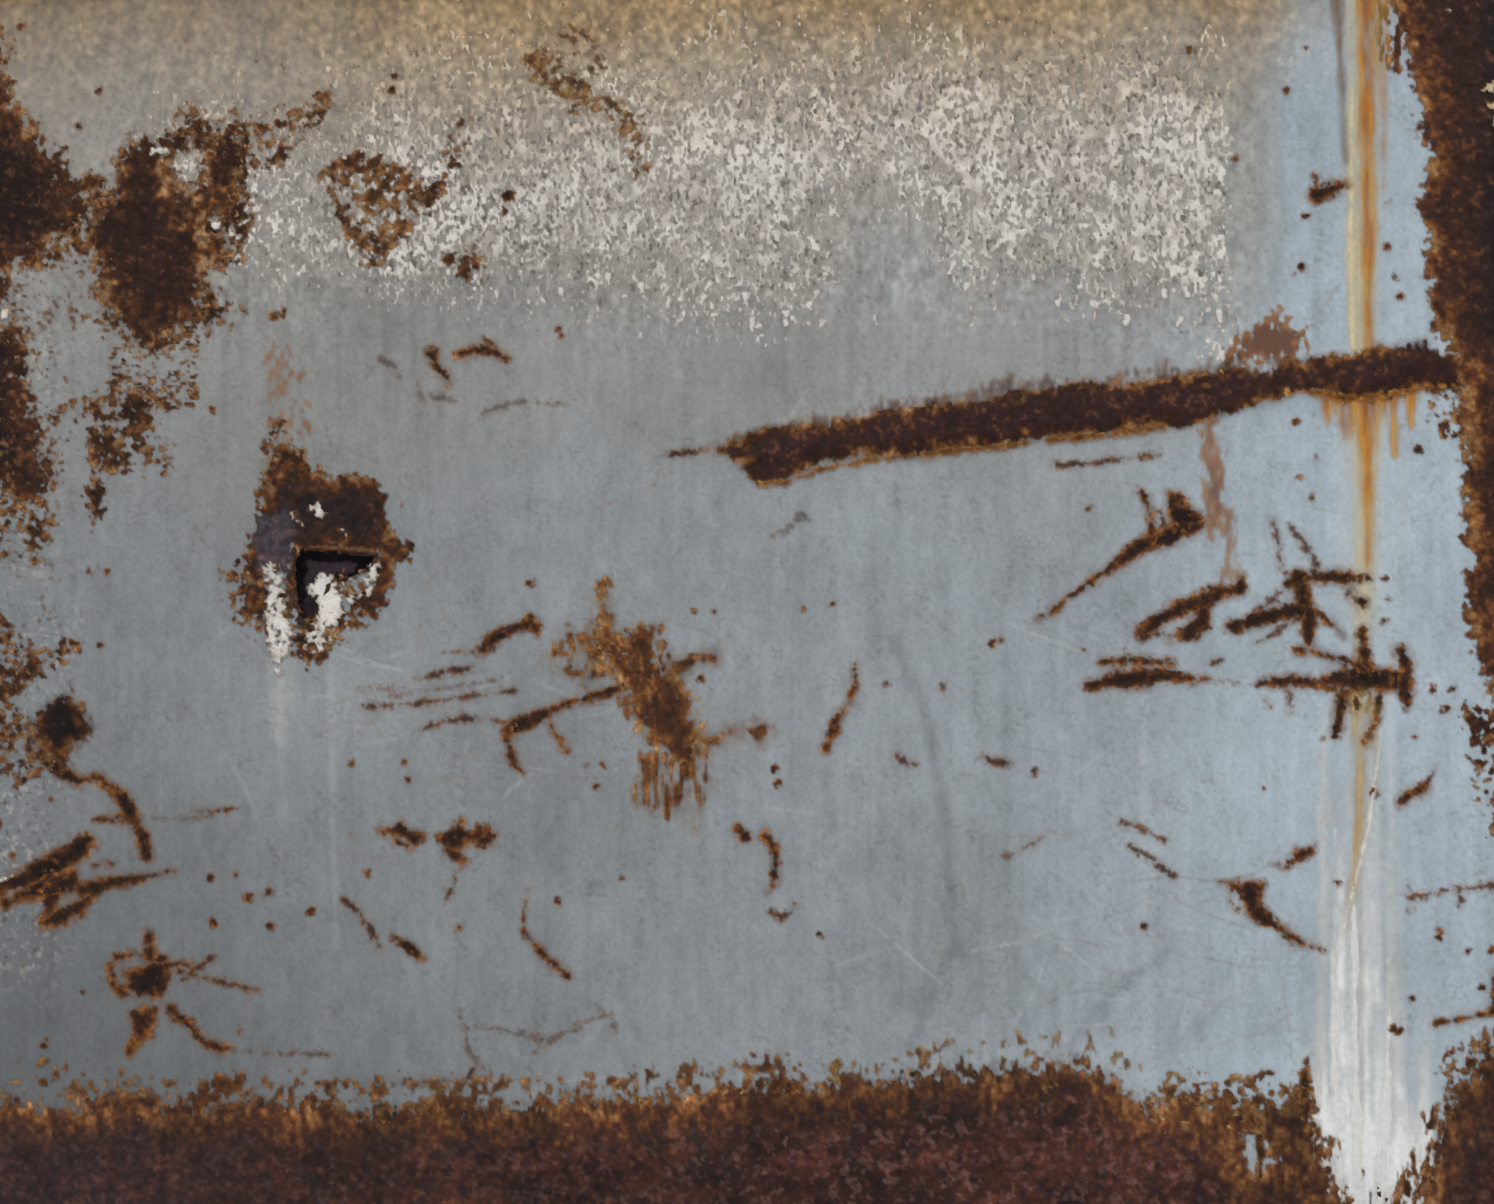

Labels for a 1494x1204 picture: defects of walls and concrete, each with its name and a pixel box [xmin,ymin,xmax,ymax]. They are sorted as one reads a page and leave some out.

corrosion [0,23,333,565]
corrosion [317,116,472,268]
corrosion [699,0,1494,838]
corrosion [238,434,415,672]
corrosion [0,613,104,794]
corrosion [551,576,767,821]
corrosion [242,888,271,903]
corrosion [1334,756,1379,887]
corrosion [0,977,1494,1204]